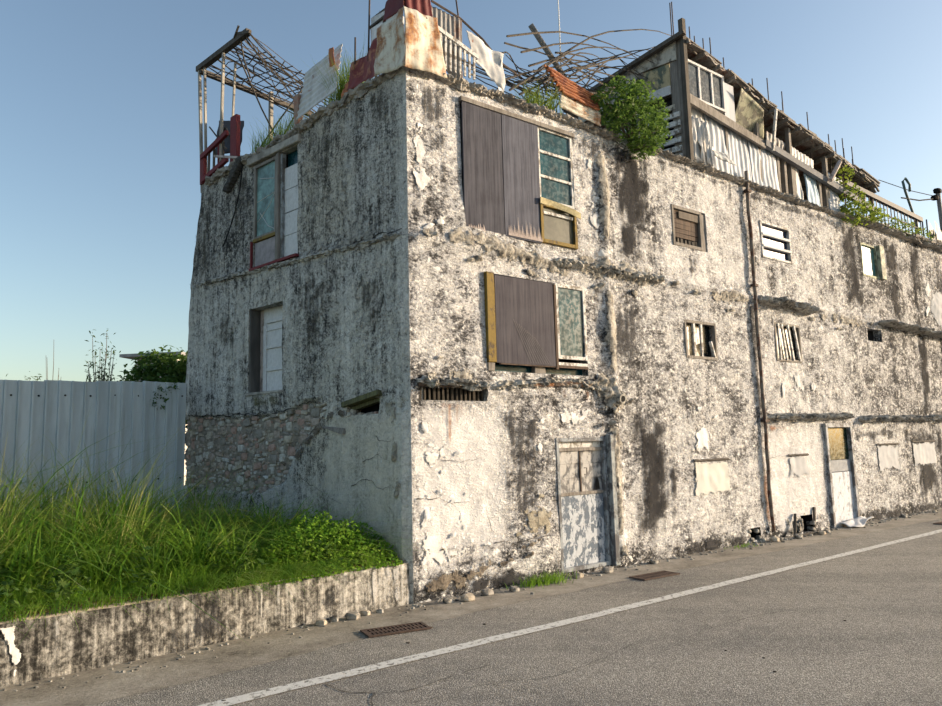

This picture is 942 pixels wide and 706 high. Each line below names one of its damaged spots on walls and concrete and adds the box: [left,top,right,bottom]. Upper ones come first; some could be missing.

damp [572,138,605,158]
damp [617,150,736,257]
spalling [184,399,346,494]
damp [634,414,676,532]
peeling [418,489,553,592]
peeling [0,626,21,676]